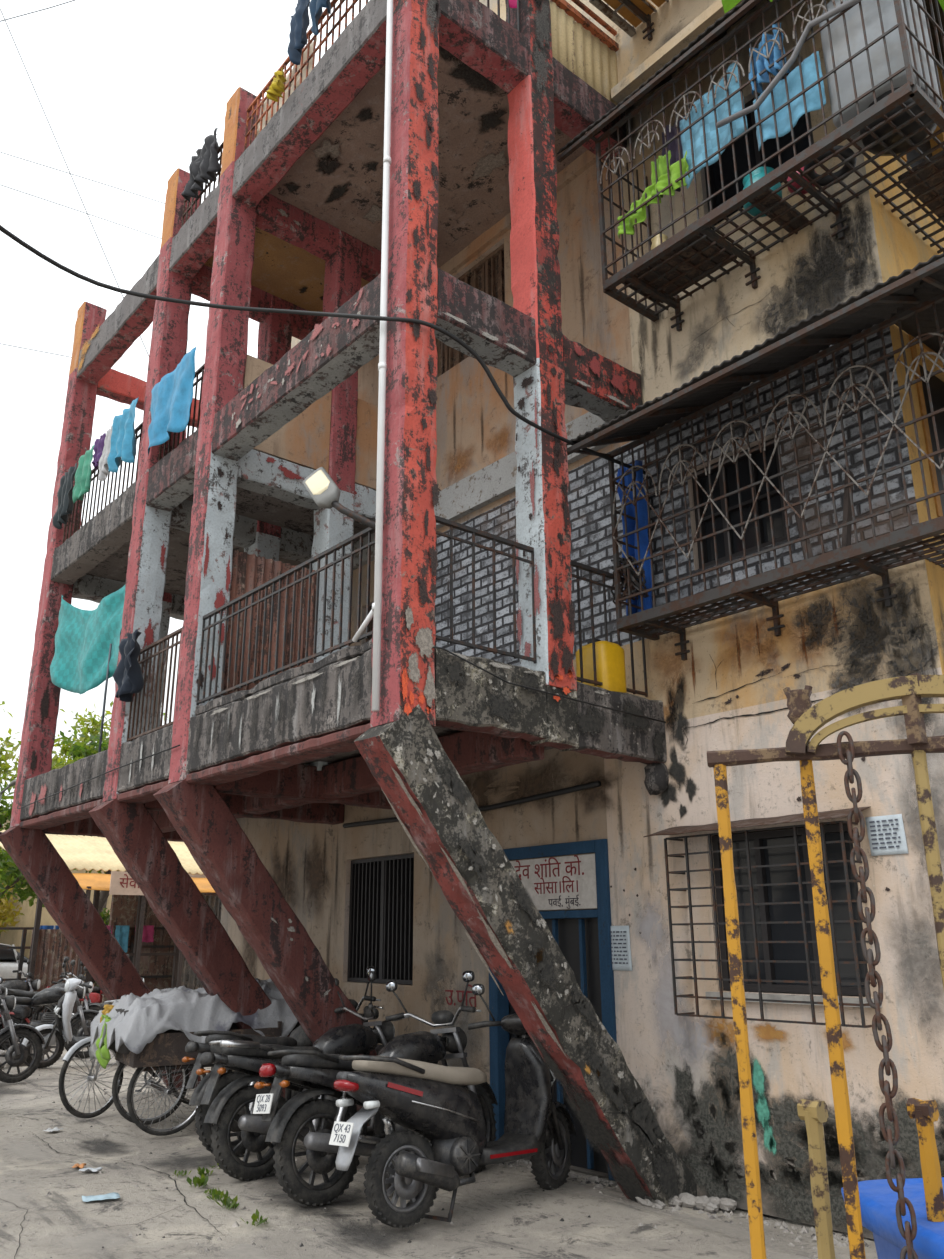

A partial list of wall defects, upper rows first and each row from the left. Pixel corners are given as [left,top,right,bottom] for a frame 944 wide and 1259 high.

mould [356,108,372,122]
peeling [415,0,441,149]
mould [439,46,497,95]
mould [479,109,506,134]
mould [317,155,349,204]
peeling [413,164,438,248]
water stain [759,202,877,336]
spalling [401,389,441,715]
peeling [143,618,154,648]
peeling [214,555,232,644]
water stain [794,578,944,695]
peeling [437,841,514,970]